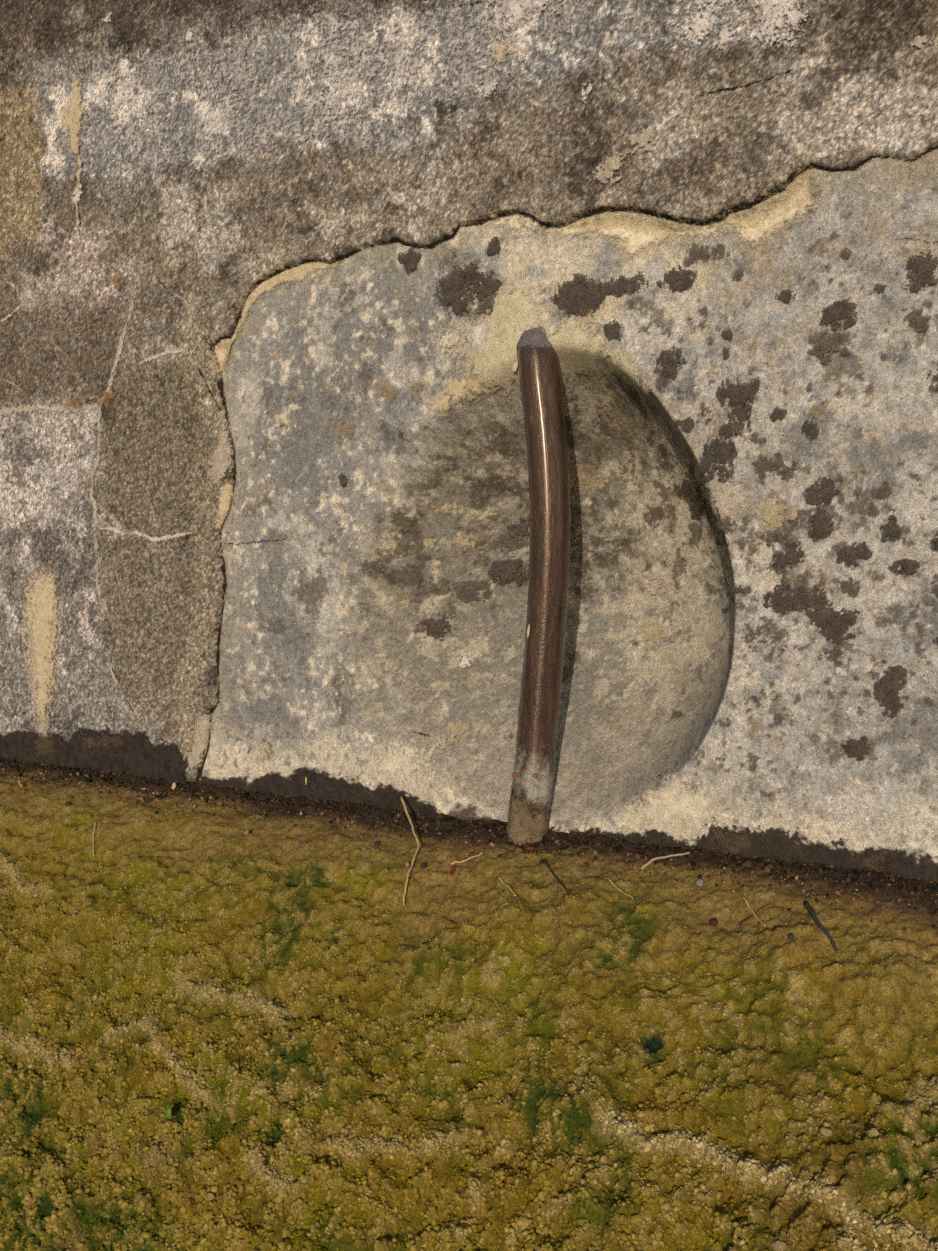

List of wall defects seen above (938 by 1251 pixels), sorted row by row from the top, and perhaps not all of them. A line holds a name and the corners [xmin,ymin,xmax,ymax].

crack [0,116,938,782]
damp [549,752,938,882]